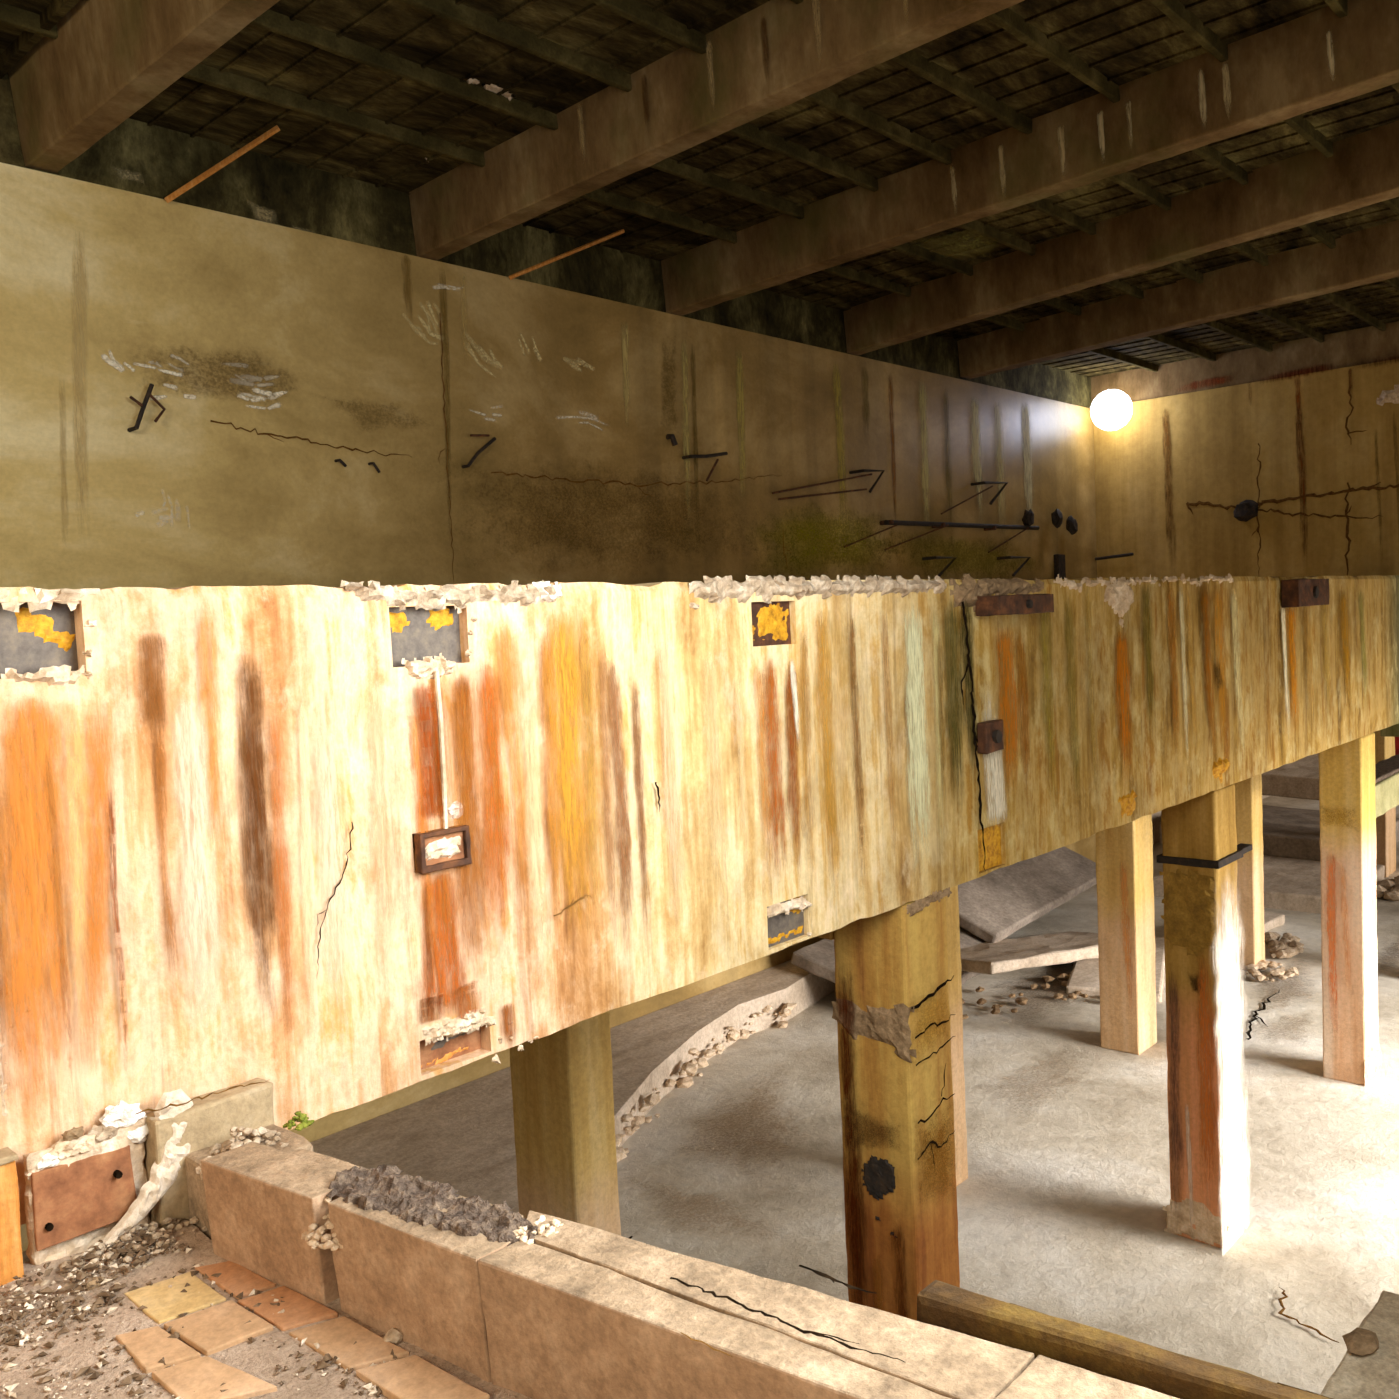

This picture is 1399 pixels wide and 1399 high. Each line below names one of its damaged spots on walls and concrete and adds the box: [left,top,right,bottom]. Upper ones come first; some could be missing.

crack [210,313,454,579]
crack [1186,443,1399,576]
crack [1345,385,1367,438]
spalling [0,587,101,686]
spalling [340,580,562,679]
rust [0,698,127,1086]
rust [412,632,526,1022]
rust [543,623,597,913]
rust [504,1005,515,1042]
crack [911,976,955,1172]
crack [670,1277,904,1362]
crack [799,1265,876,1293]